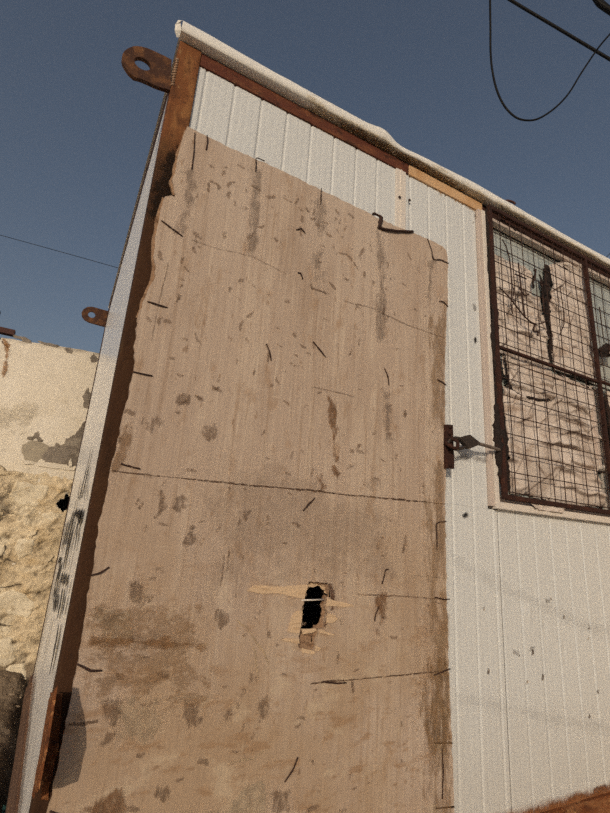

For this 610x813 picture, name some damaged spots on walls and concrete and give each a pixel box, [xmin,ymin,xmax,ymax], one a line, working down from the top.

peeling [82,387,91,409]
spalling [0,422,85,686]
rust [525,784,610,813]